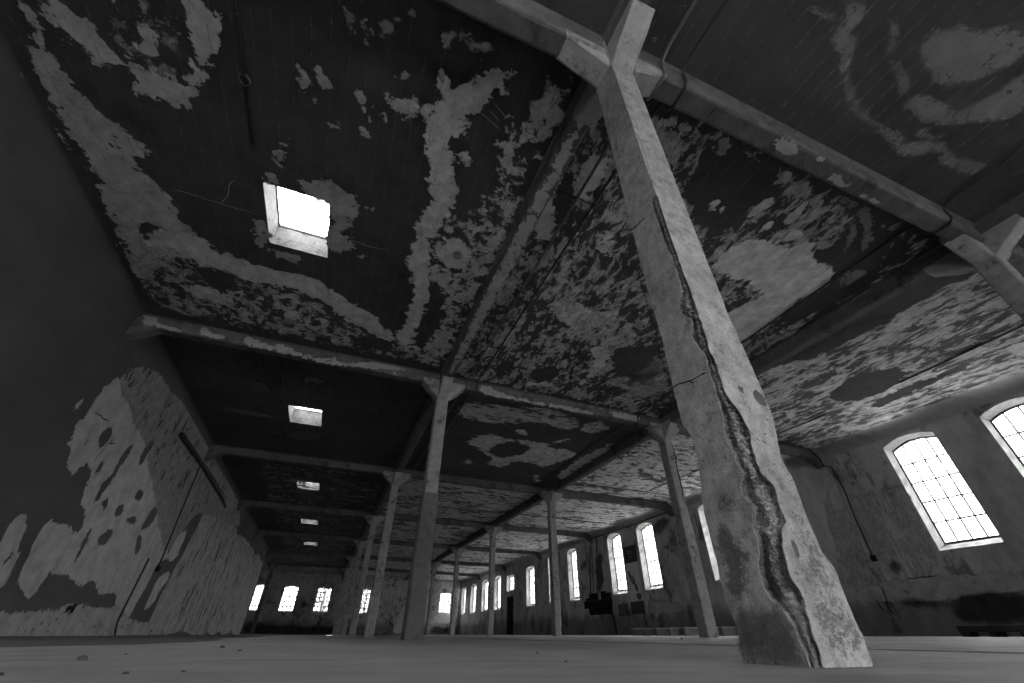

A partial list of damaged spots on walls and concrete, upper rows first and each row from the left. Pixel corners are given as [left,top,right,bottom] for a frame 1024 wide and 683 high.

peeling [0,366,263,636]
peeling [18,0,701,580]
spalling [652,195,822,668]
peeling [646,104,930,362]
peeling [753,273,1024,460]